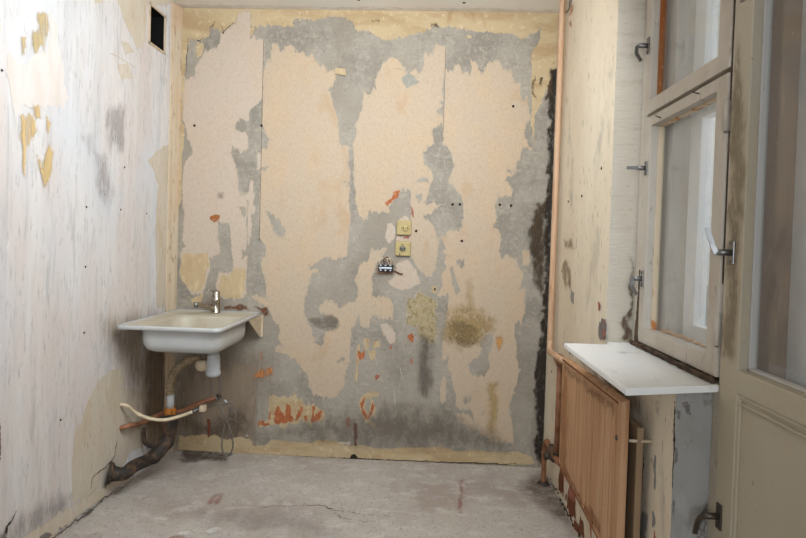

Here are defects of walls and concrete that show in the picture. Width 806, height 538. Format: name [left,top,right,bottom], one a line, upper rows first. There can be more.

peeling [111,0,172,80]
peeling [148,145,169,308]
peeling [385,207,414,245]
peeling [388,260,421,290]
peeling [522,250,531,266]
leakage [529,68,557,462]
leakage [444,309,491,346]
peeling [355,338,392,382]
peeling [258,392,325,429]
crack [2,513,16,538]
crack [53,443,123,538]
crack [548,479,580,538]